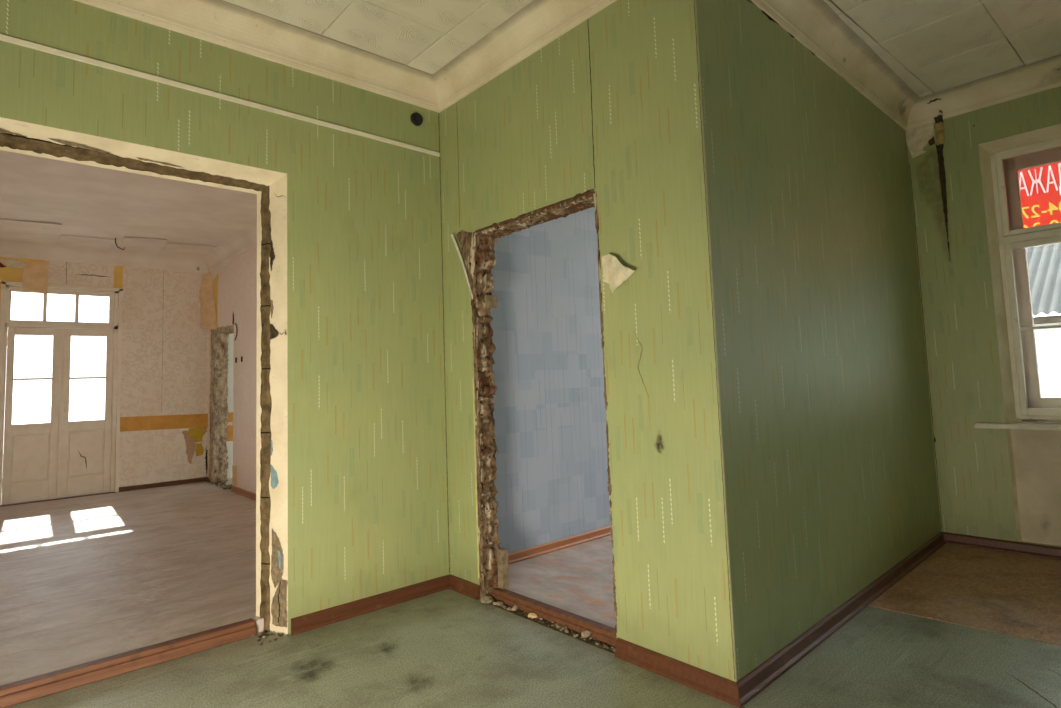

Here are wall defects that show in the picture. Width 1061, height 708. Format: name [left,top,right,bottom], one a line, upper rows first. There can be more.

flaking render [0,128,287,631]